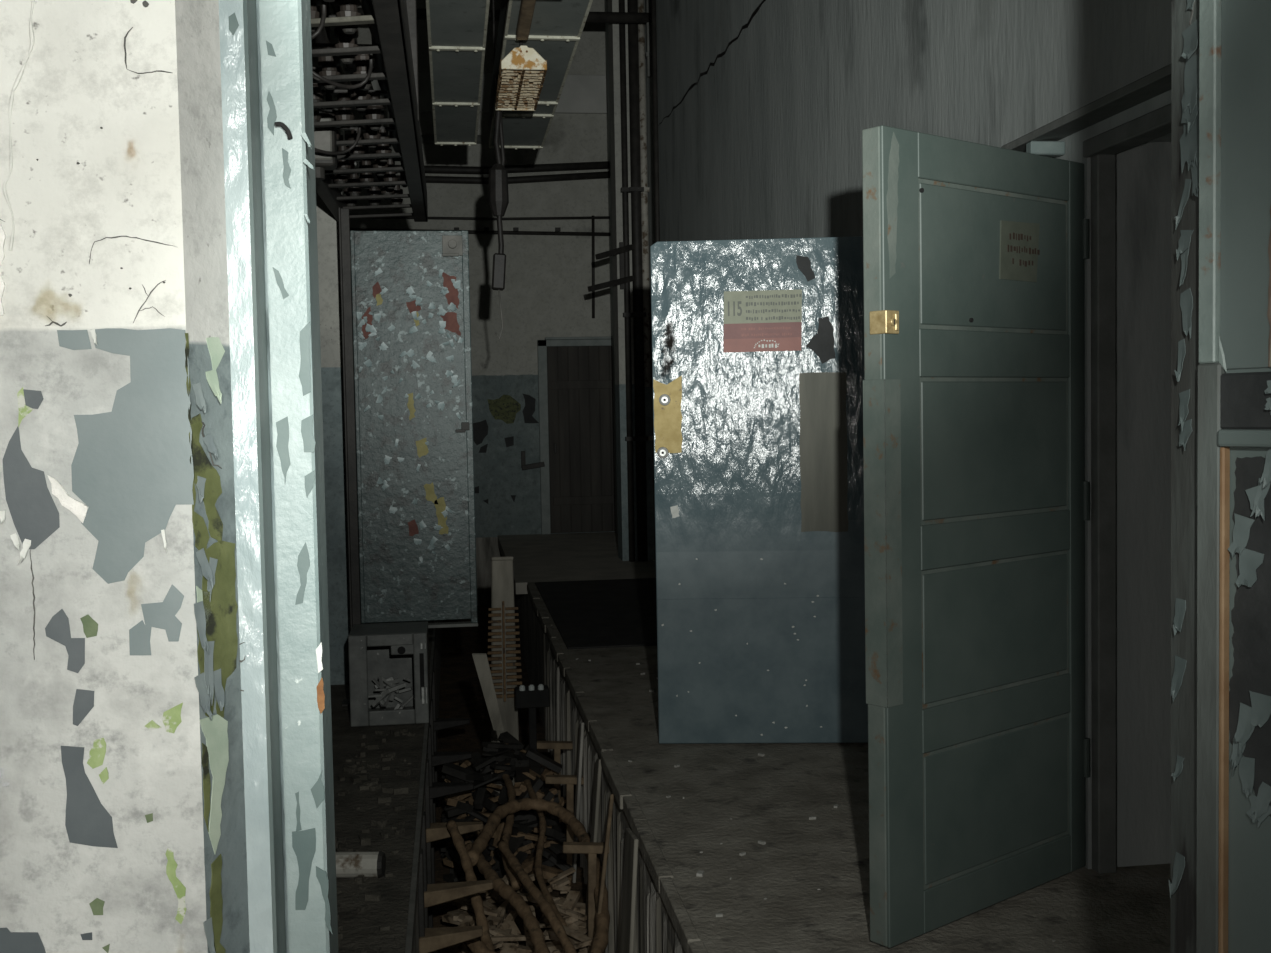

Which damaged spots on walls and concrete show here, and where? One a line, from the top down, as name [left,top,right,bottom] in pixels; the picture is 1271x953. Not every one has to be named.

crack [124,27,172,74]
crack [658,0,766,126]
crack [89,236,176,264]
crack [133,280,166,323]
peeling [0,328,238,953]
peeling [1228,448,1271,829]